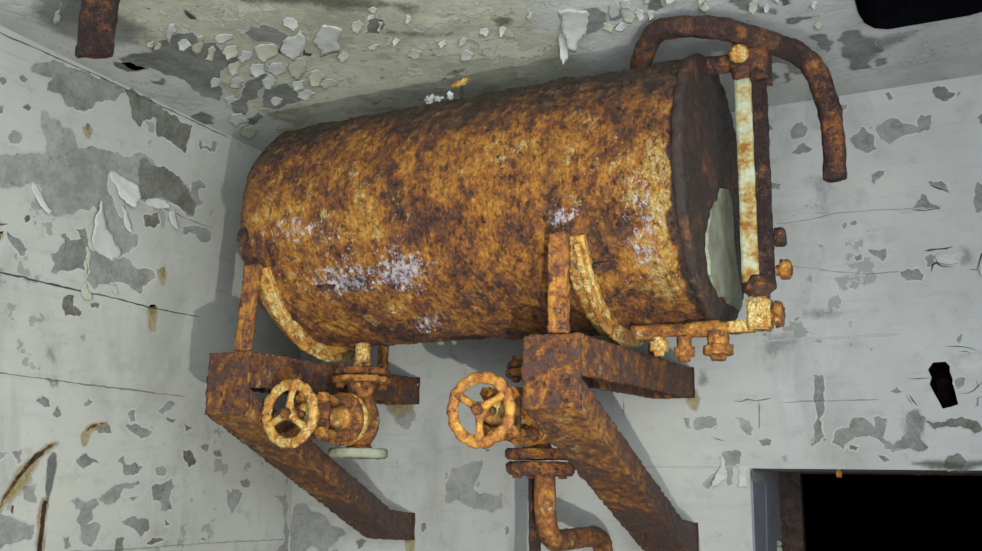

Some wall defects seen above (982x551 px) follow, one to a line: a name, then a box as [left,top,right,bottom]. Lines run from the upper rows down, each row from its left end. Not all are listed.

peeling [727,0,888,71]
peeling [112,7,388,140]
peeling [931,85,957,103]
peeling [848,113,933,155]
peeling [0,58,218,318]
crack [926,247,982,272]
rust [148,308,157,330]
rust [82,422,107,445]
peeling [182,443,223,469]
peeling [810,362,982,464]
peeling [0,443,57,551]
peeling [62,454,176,551]